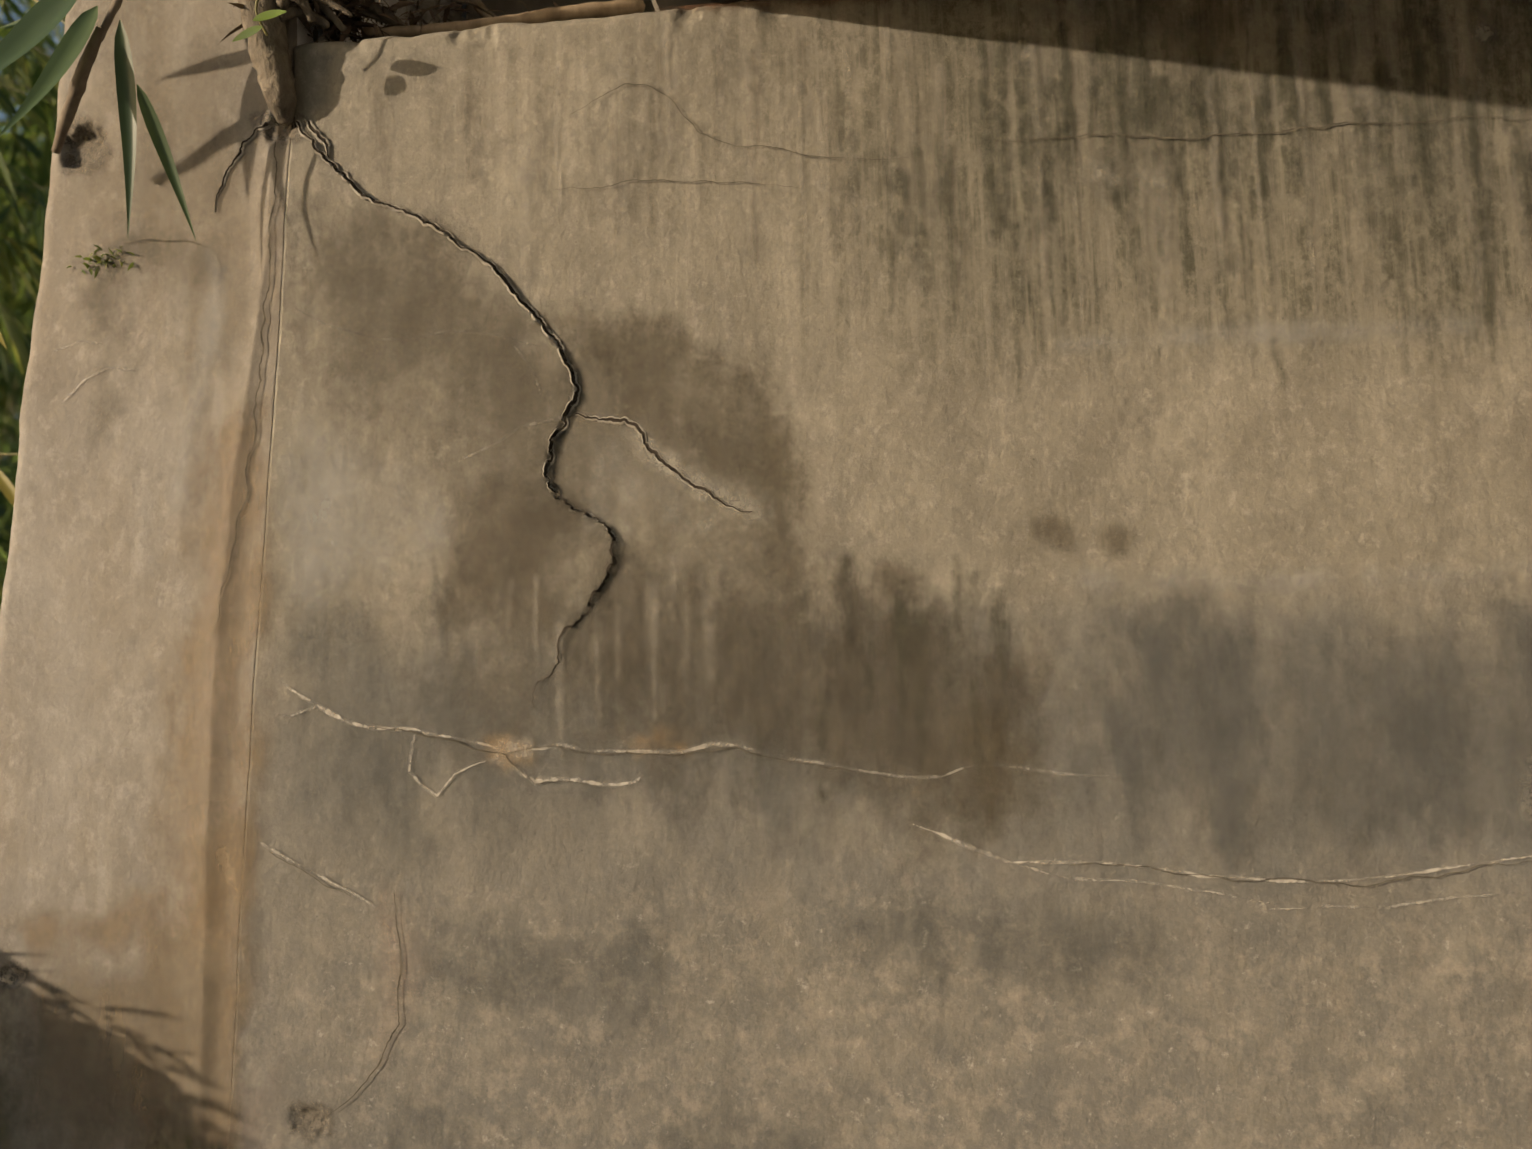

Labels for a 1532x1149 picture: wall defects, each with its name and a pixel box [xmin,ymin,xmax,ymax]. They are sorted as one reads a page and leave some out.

crack [126,120,752,708]
leakage [561,562,1027,799]
crack [275,689,964,797]
crack [913,824,966,846]
crack [1013,855,1532,909]